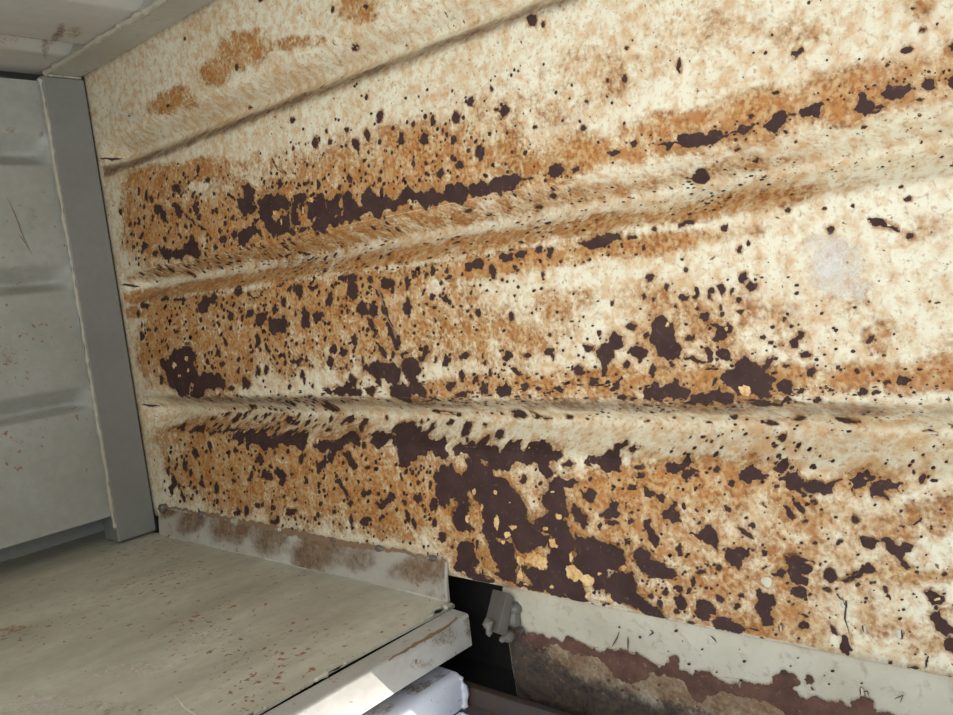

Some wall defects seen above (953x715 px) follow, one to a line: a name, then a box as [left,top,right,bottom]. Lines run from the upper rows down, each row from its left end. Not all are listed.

corrosion [200,28,325,87]
corrosion [339,0,377,23]
corrosion [405,0,570,61]
peeling [526,14,546,28]
corrosion [913,0,932,16]
corrosion [103,45,953,413]
peeling [118,65,953,656]
corrosion [155,398,552,593]
water stain [167,506,446,562]
corrosion [563,452,953,647]
corrosion [860,613,943,654]
corrosion [524,632,894,715]